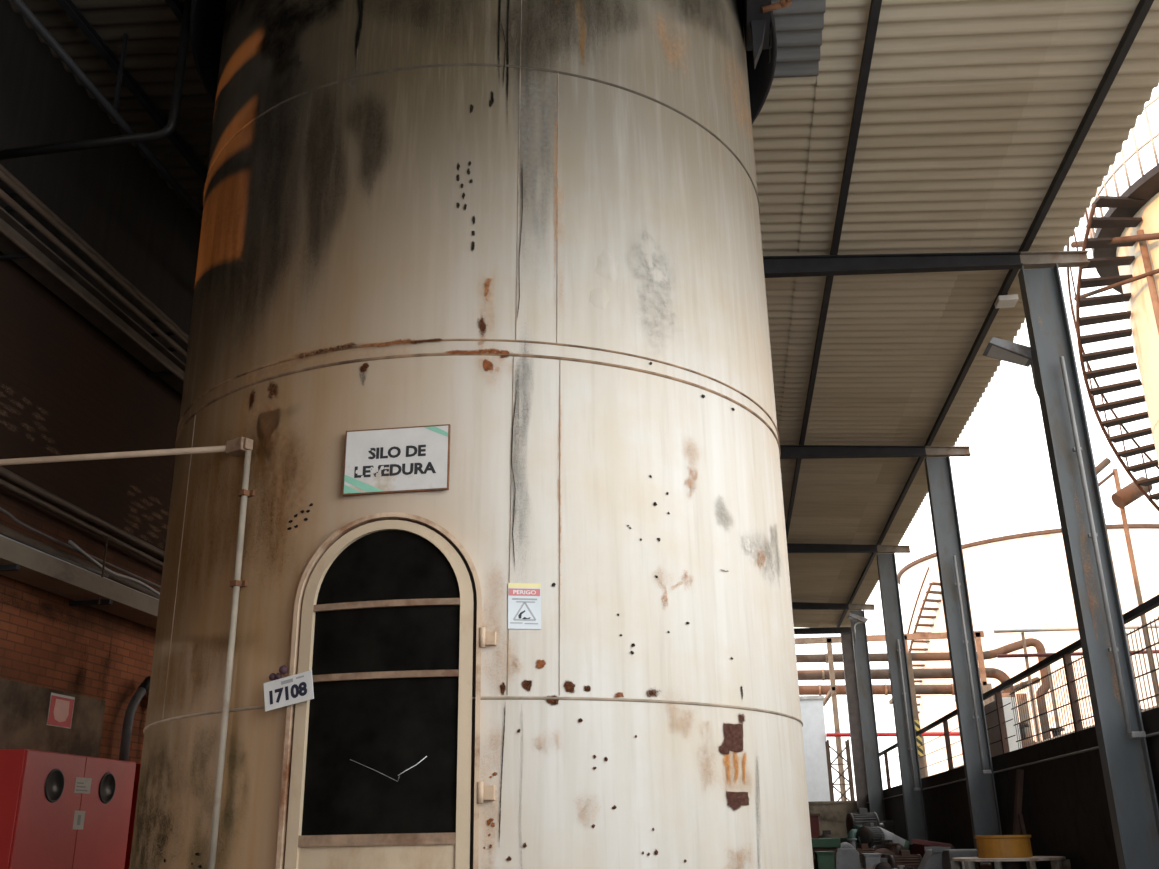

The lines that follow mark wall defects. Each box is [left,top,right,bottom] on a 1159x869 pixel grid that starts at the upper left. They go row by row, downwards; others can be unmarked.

leakage [488,0,734,287]
corrosion [237,274,514,455]
leakage [507,323,535,583]
leakage [128,705,252,869]
corrosion [545,681,591,705]
corrosion [646,686,756,801]